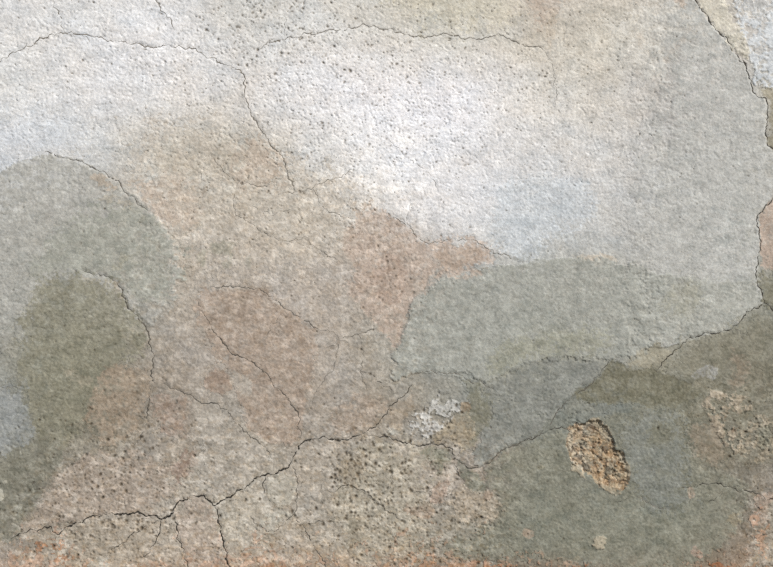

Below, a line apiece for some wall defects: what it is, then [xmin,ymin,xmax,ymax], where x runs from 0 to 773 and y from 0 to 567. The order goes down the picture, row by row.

rust [0,518,111,567]
peeling [0,152,188,358]
peeling [19,287,319,567]
crack [0,0,351,260]
water stain [0,94,388,544]
rust [177,516,345,567]
crack [11,271,610,567]
crack [261,19,558,104]
rust [354,516,592,567]
peeling [306,0,773,567]
water stain [385,292,773,567]
crack [695,0,773,149]